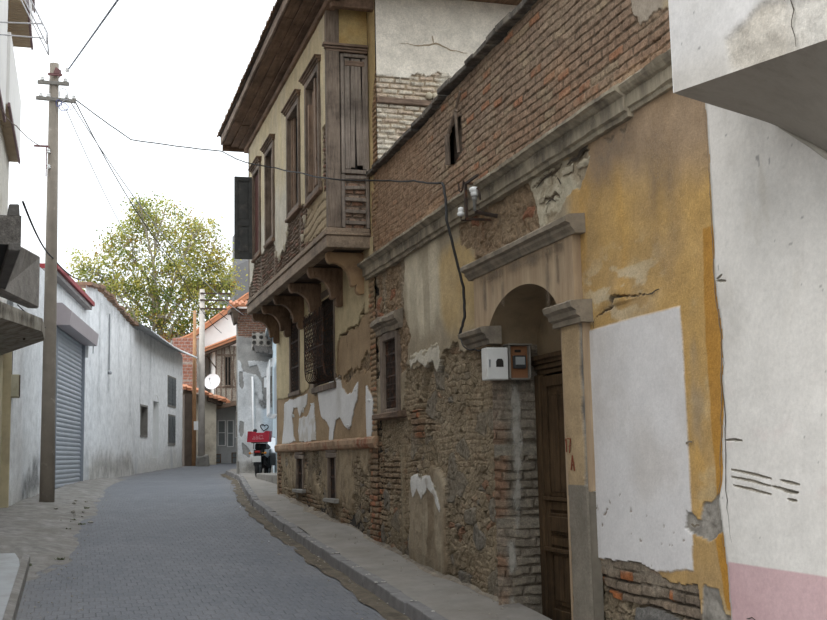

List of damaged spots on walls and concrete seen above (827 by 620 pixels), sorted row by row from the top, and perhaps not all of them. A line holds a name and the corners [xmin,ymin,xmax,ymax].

flaking render [631,0,669,24]
crack [400,36,463,53]
spalling [459,145,590,260]
crack [593,289,659,328]
flaking render [239,357,273,402]
spalling [277,260,498,597]
spalling [684,492,723,542]
spalling [600,557,731,620]